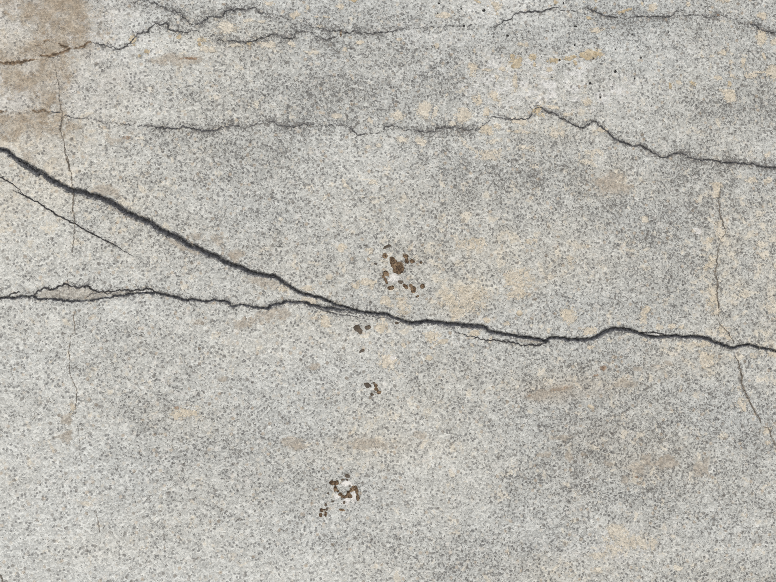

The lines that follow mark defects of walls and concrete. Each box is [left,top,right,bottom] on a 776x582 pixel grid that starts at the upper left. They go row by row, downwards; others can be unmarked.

crack [93,0,472,49]
crack [493,6,776,33]
crack [0,60,776,461]